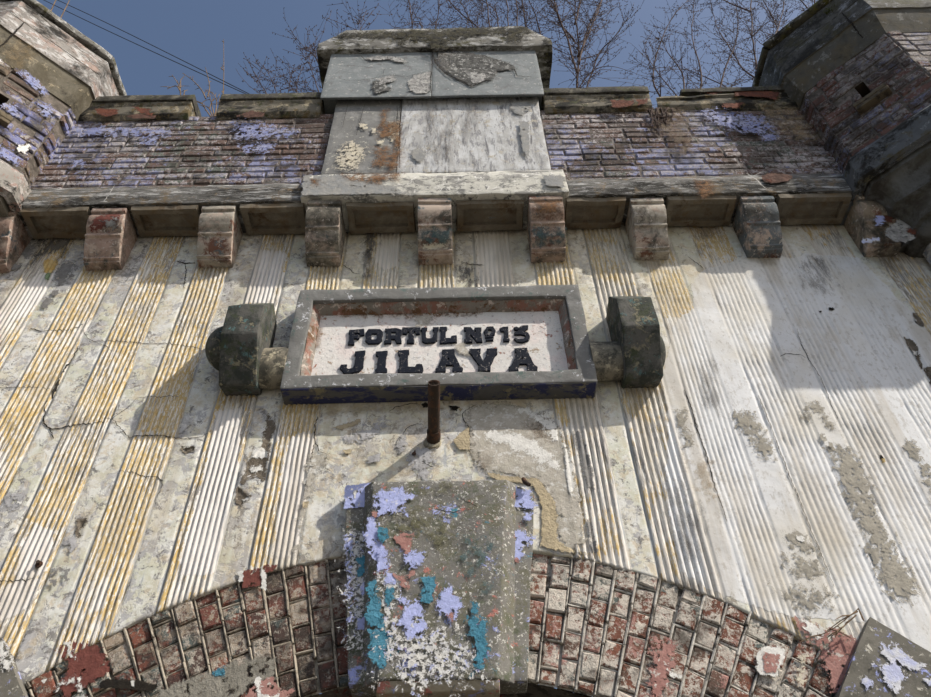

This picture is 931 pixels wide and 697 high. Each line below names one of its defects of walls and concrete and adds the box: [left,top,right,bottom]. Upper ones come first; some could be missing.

peeling [16,70,54,118]
flaking render [371,50,518,93]
peeling [0,143,31,164]
peeling [328,122,400,172]
crack [0,324,207,439]
flaking render [904,337,931,384]
peeling [234,414,277,508]
flaking render [453,400,599,563]
peeling [334,483,505,697]
peeling [41,640,157,697]
peeling [245,676,295,697]
peeling [861,641,931,694]